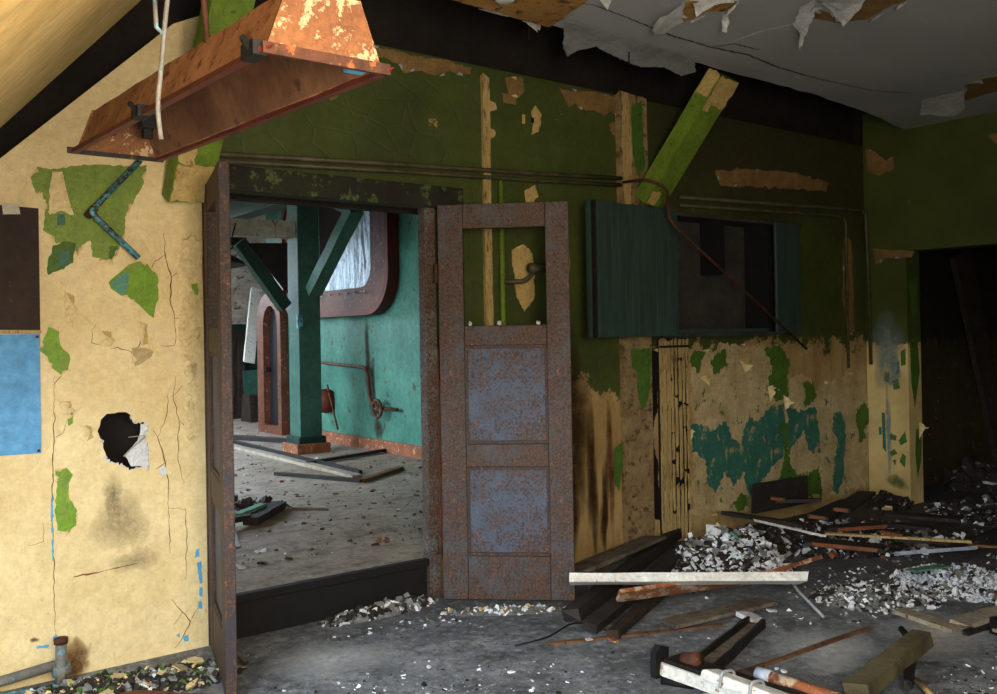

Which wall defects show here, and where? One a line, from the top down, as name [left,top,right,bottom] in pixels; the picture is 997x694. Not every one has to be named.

flaking render [559,88,616,136]
peeling [559,0,740,112]
peeling [793,0,865,48]
peeling [29,164,159,376]
crack [30,376,66,635]
peeling [50,467,78,561]
peeling [59,399,104,443]
spalling [103,416,167,476]
crack [153,378,187,579]
water stain [571,358,614,545]
peeling [652,336,929,541]
crack [172,600,197,648]